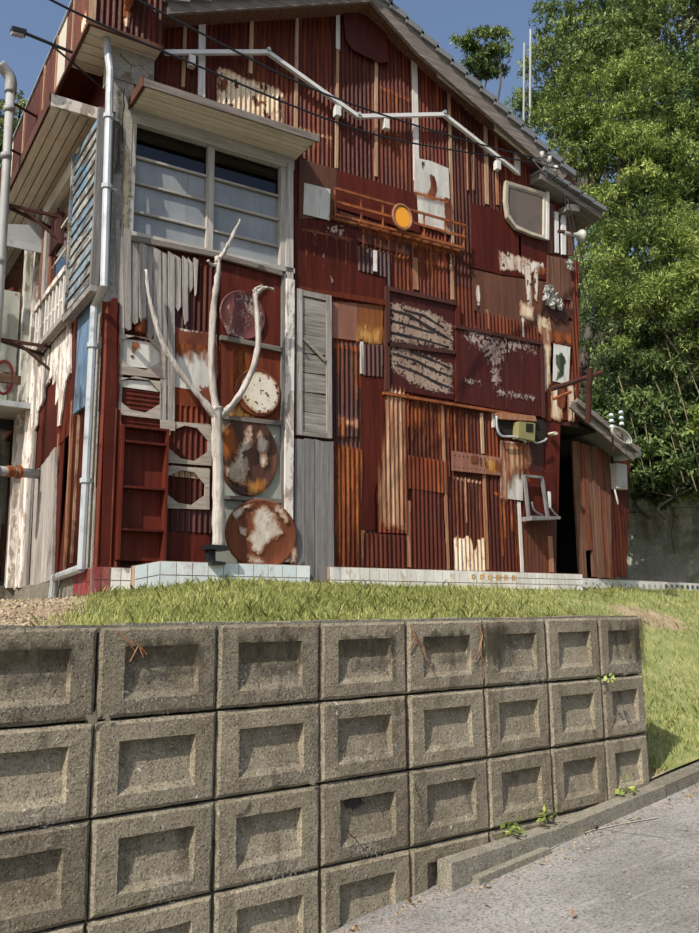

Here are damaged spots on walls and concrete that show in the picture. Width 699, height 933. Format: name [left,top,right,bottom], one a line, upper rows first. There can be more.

peeling [216,66,285,124]
corrosion [175,327,219,401]
peeling [241,371,279,414]
peeling [377,250,571,532]
peeling [222,425,289,564]
corrosion [409,401,532,556]
peeling [453,535,486,571]